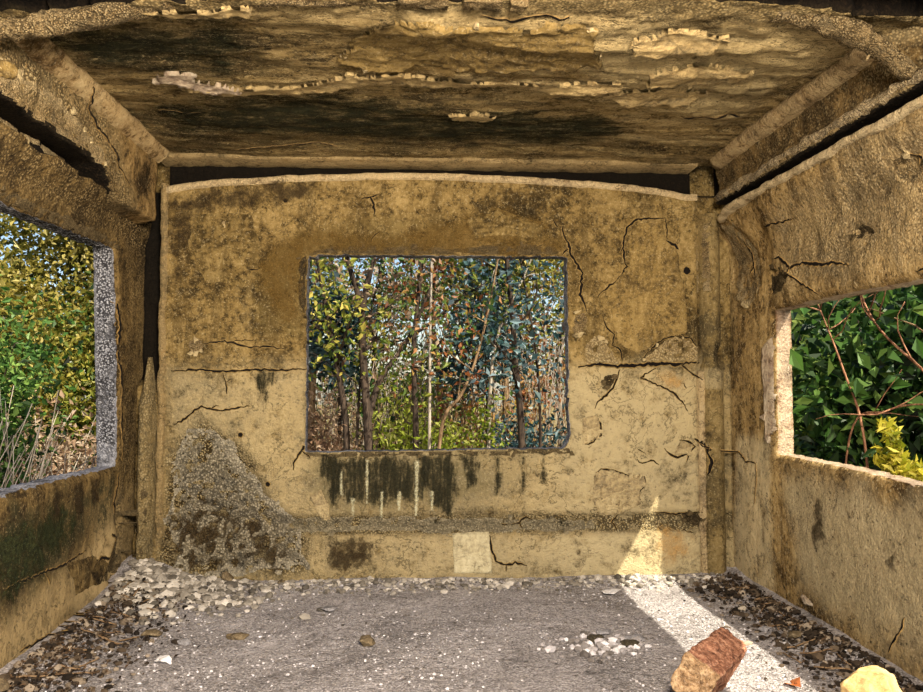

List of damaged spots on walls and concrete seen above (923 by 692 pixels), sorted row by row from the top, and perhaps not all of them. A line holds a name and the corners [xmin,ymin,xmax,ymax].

damp [33,22,249,76]
spalling [0,0,372,42]
peeling [152,0,754,108]
spalling [0,57,116,166]
damp [154,93,634,144]
crack [553,217,703,445]
crack [171,339,307,425]
damp [320,454,480,526]
spalling [163,429,646,577]
crack [489,516,533,571]
crack [597,438,757,533]